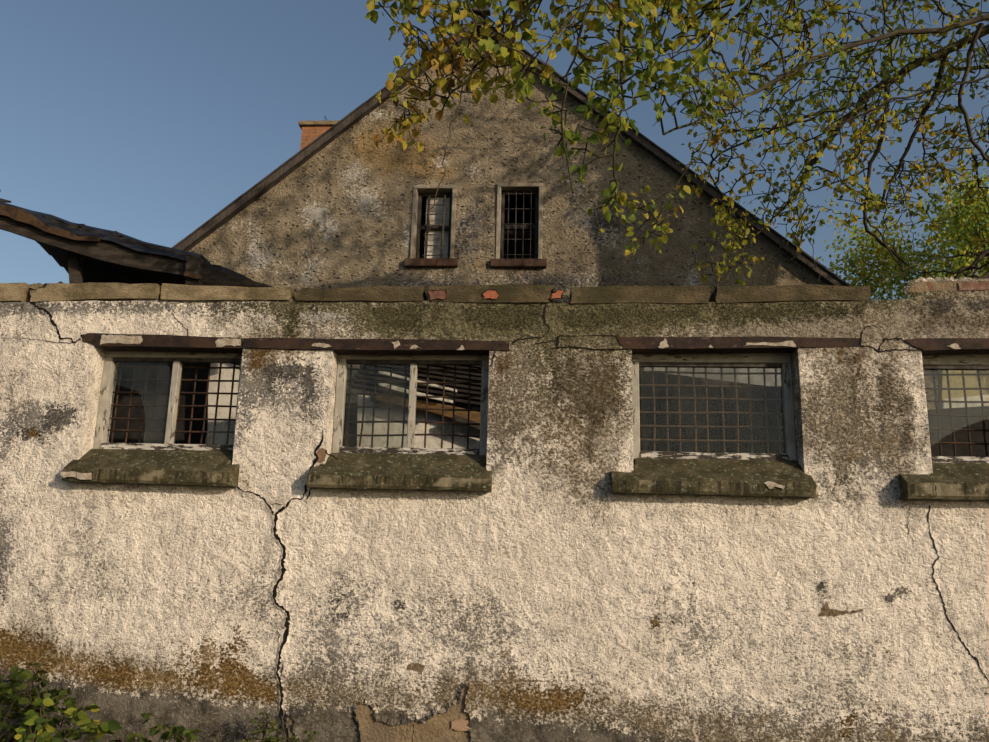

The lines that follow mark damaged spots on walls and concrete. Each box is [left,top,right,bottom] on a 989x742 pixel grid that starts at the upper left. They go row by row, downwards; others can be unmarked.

crack [6,283,84,344]
crack [482,289,627,367]
spalling [904,276,989,297]
damp [10,404,81,444]
crack [234,429,338,742]
peeling [819,603,863,617]
crack [907,482,989,694]
spalling [351,679,556,742]